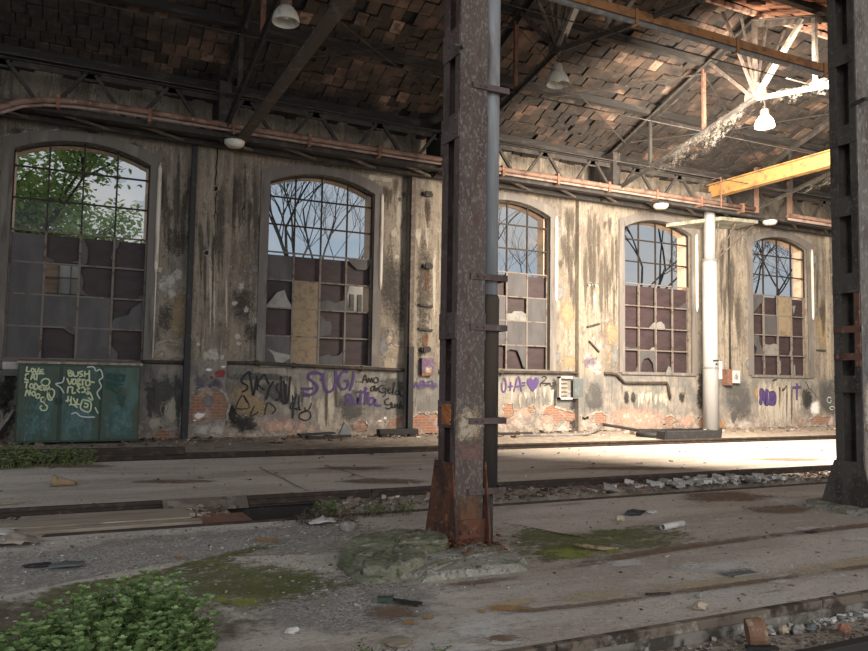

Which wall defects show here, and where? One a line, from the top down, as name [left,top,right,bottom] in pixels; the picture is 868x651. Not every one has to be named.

damp [158,157,260,344]
crack [212,148,220,264]
damp [364,174,406,331]
damp [415,197,436,361]
damp [559,208,618,364]
damp [146,375,182,430]
spalling [188,385,231,426]
spalling [502,402,609,427]